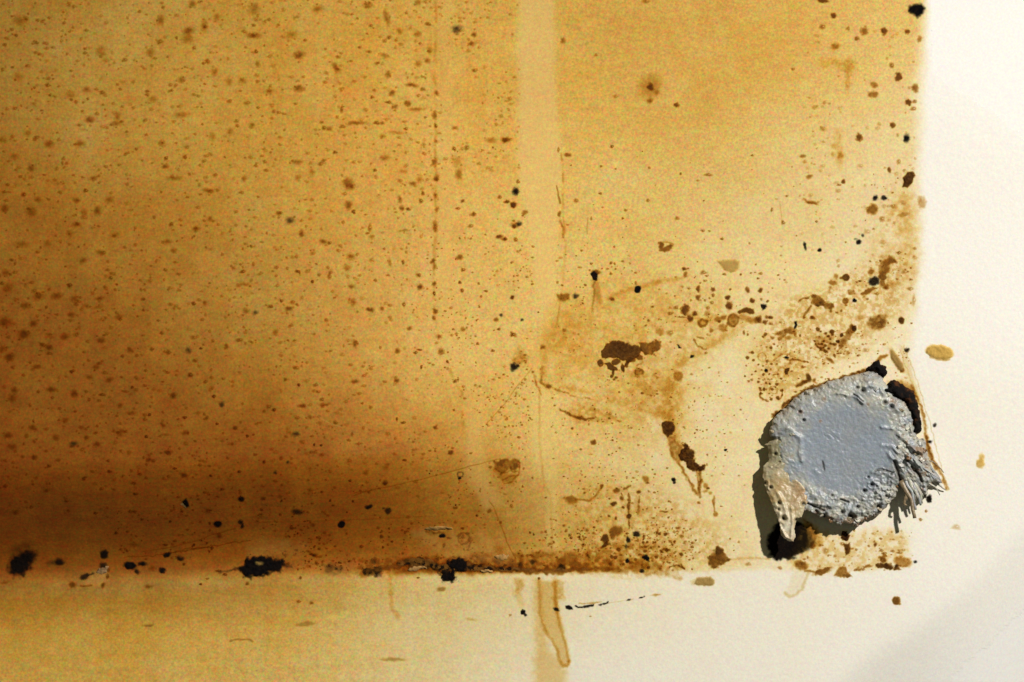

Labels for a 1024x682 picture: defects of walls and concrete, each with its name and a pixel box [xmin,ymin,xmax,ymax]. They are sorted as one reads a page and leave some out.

water stain [908,4,925,17]
rust [662,421,675,437]
rust [679,443,709,489]
peeling [762,414,898,541]
peeling [898,440,928,470]
water stain [10,550,36,577]
water stain [239,555,285,579]
water stain [405,557,496,583]